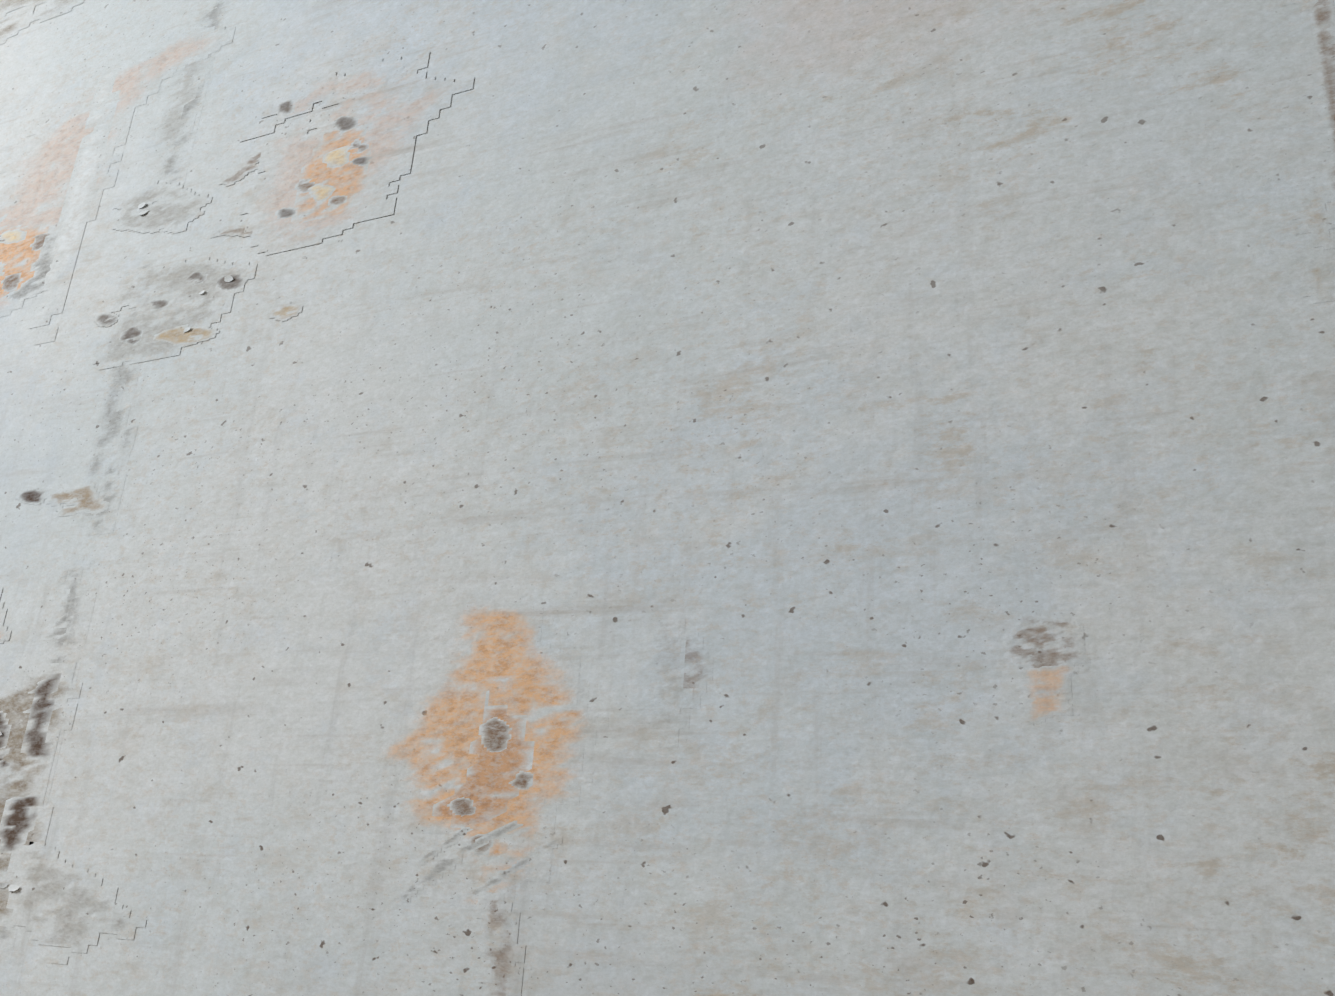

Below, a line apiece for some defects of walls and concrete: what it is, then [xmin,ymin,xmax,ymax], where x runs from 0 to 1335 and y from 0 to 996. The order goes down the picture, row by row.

peeling [0,0,84,44]
rust [0,26,236,345]
peeling [112,149,262,234]
peeling [210,225,253,238]
peeling [92,257,257,370]
peeling [15,484,109,517]
rust [377,599,609,907]
peeling [0,662,147,965]